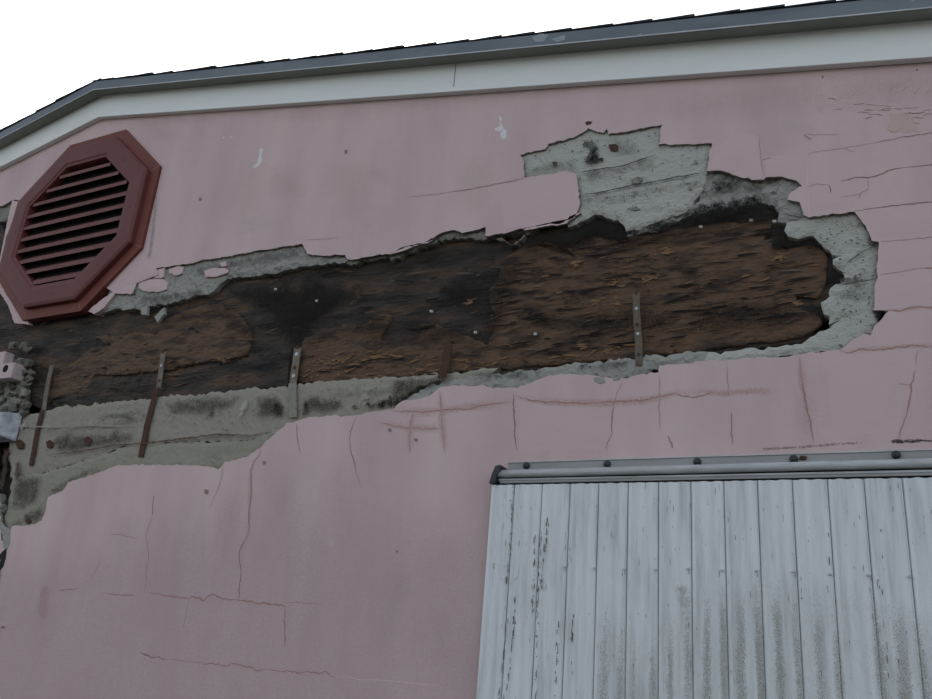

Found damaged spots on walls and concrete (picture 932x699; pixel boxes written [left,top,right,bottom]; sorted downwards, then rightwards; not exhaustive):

crack [804,98,932,153]
crack [810,164,932,211]
crack [847,237,932,284]
spalling [0,121,879,529]
water stain [165,395,285,420]
water stain [301,375,451,416]
crack [380,365,733,453]
crack [799,358,814,443]
crack [840,344,932,438]
crack [0,520,11,570]
crack [61,449,322,645]
crack [140,652,437,686]